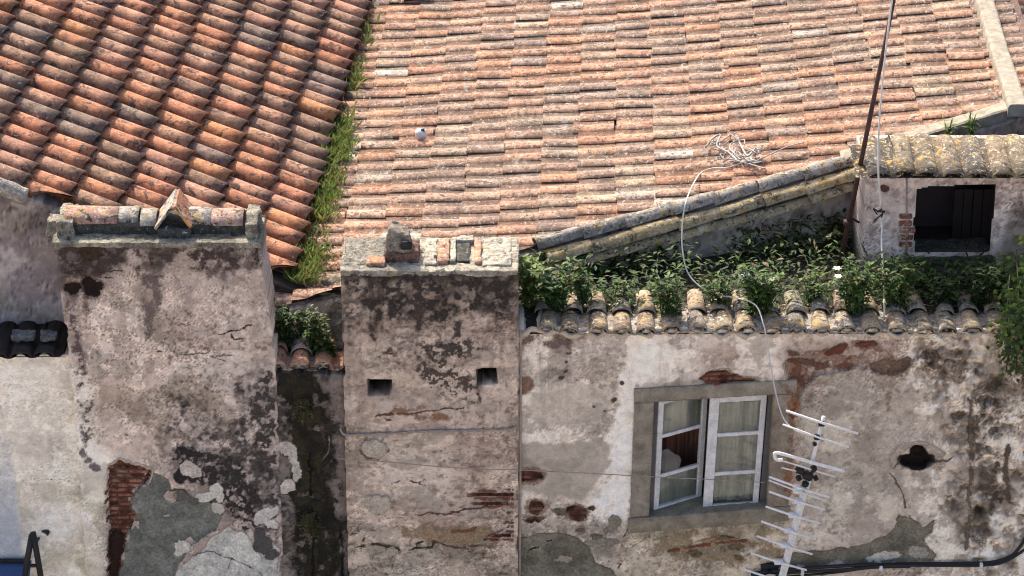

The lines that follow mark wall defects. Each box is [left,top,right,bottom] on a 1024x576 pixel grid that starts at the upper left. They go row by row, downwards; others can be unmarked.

water stain [66,300,100,472]
flaking render [89,457,225,576]
water stain [58,247,260,341]
crack [157,325,252,362]
water stain [172,365,347,576]
peeling [279,441,302,495]
crack [375,407,464,421]
water stain [415,338,482,404]
flaking render [466,467,622,576]
flaking render [782,340,913,395]
flaking render [769,440,954,568]
water stain [964,384,1011,559]